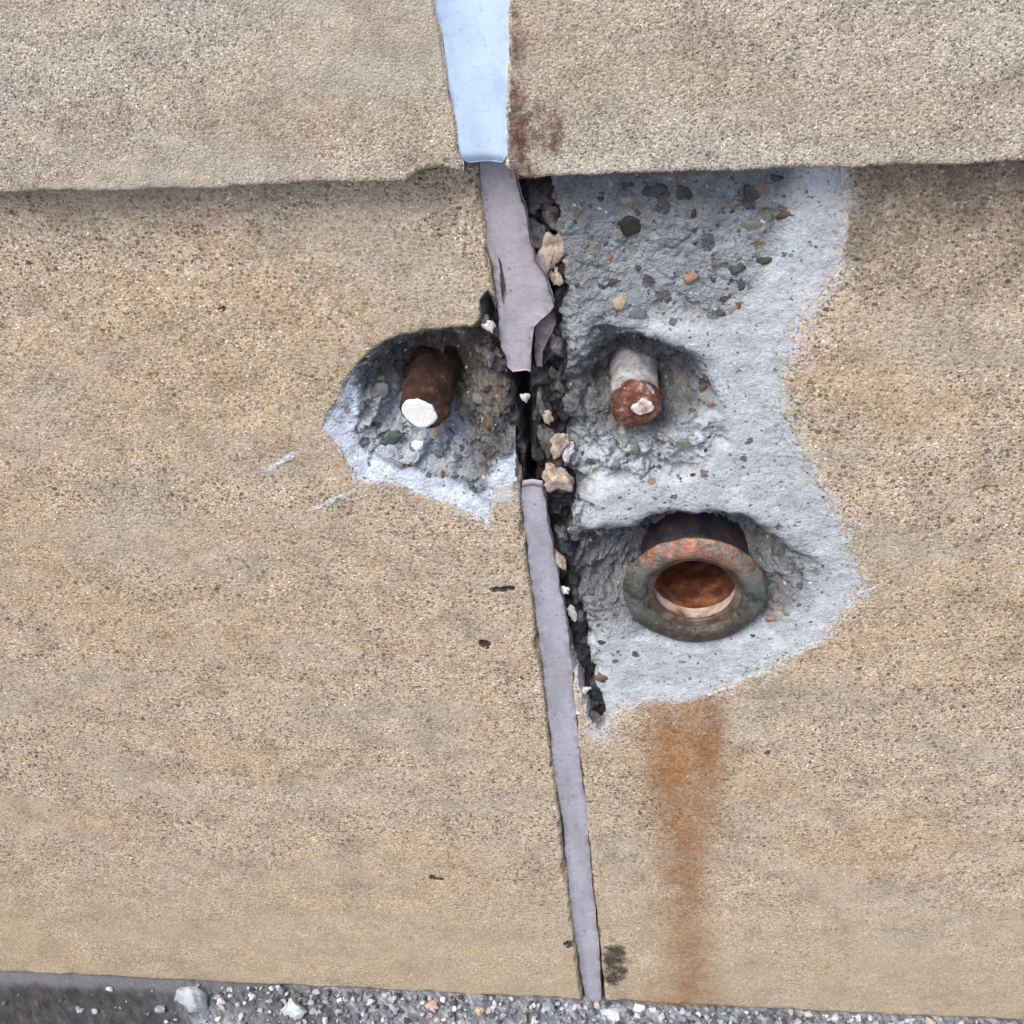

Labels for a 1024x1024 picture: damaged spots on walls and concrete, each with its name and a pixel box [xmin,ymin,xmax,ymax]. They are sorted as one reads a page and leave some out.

spalling [324,290,519,523]
crack [492,175,606,723]
spalling [551,167,877,736]
rust [657,703,718,850]